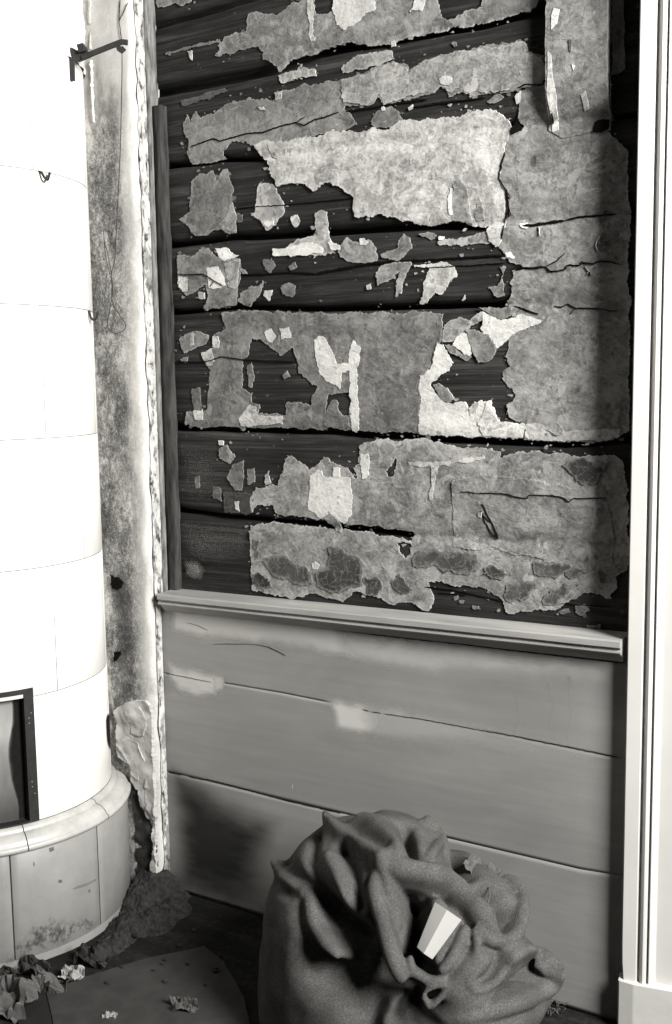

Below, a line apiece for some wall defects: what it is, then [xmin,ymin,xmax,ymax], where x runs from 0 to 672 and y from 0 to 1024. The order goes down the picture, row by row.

peeling [332,0,376,30]
peeling [341,40,559,132]
crack [191,112,339,147]
peeling [177,247,248,299]
peeling [263,232,445,301]
crack [515,253,621,276]
crack [516,303,616,314]
peeling [442,307,541,363]
peeling [314,336,361,433]
peeling [468,402,522,438]
peeling [307,453,370,533]
crack [461,491,606,502]